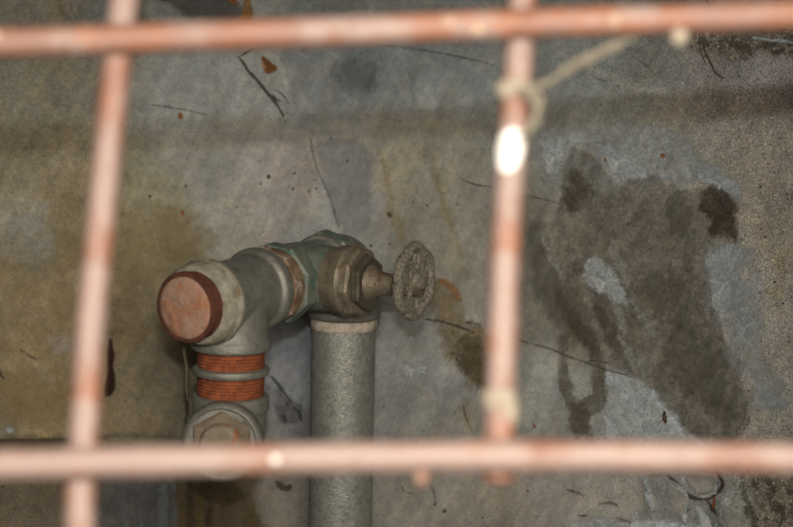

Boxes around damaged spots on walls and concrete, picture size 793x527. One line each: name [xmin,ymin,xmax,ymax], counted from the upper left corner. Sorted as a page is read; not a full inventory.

crack [238,49,289,117]
corrosion [261,56,277,74]
water stain [533,123,787,441]
crack [518,339,632,378]